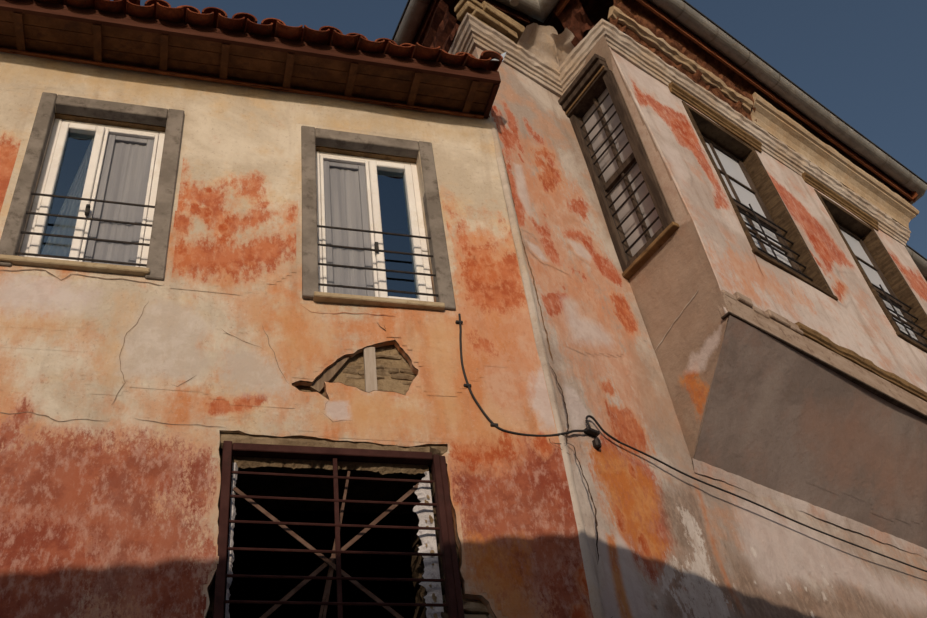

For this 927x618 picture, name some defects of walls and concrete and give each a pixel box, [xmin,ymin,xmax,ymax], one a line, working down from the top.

peeling [624,72,734,215]
crack [0,269,159,422]
crack [135,418,226,428]
crack [223,326,287,382]
peeling [0,95,731,618]
crack [501,147,599,561]
leakage [620,223,927,618]